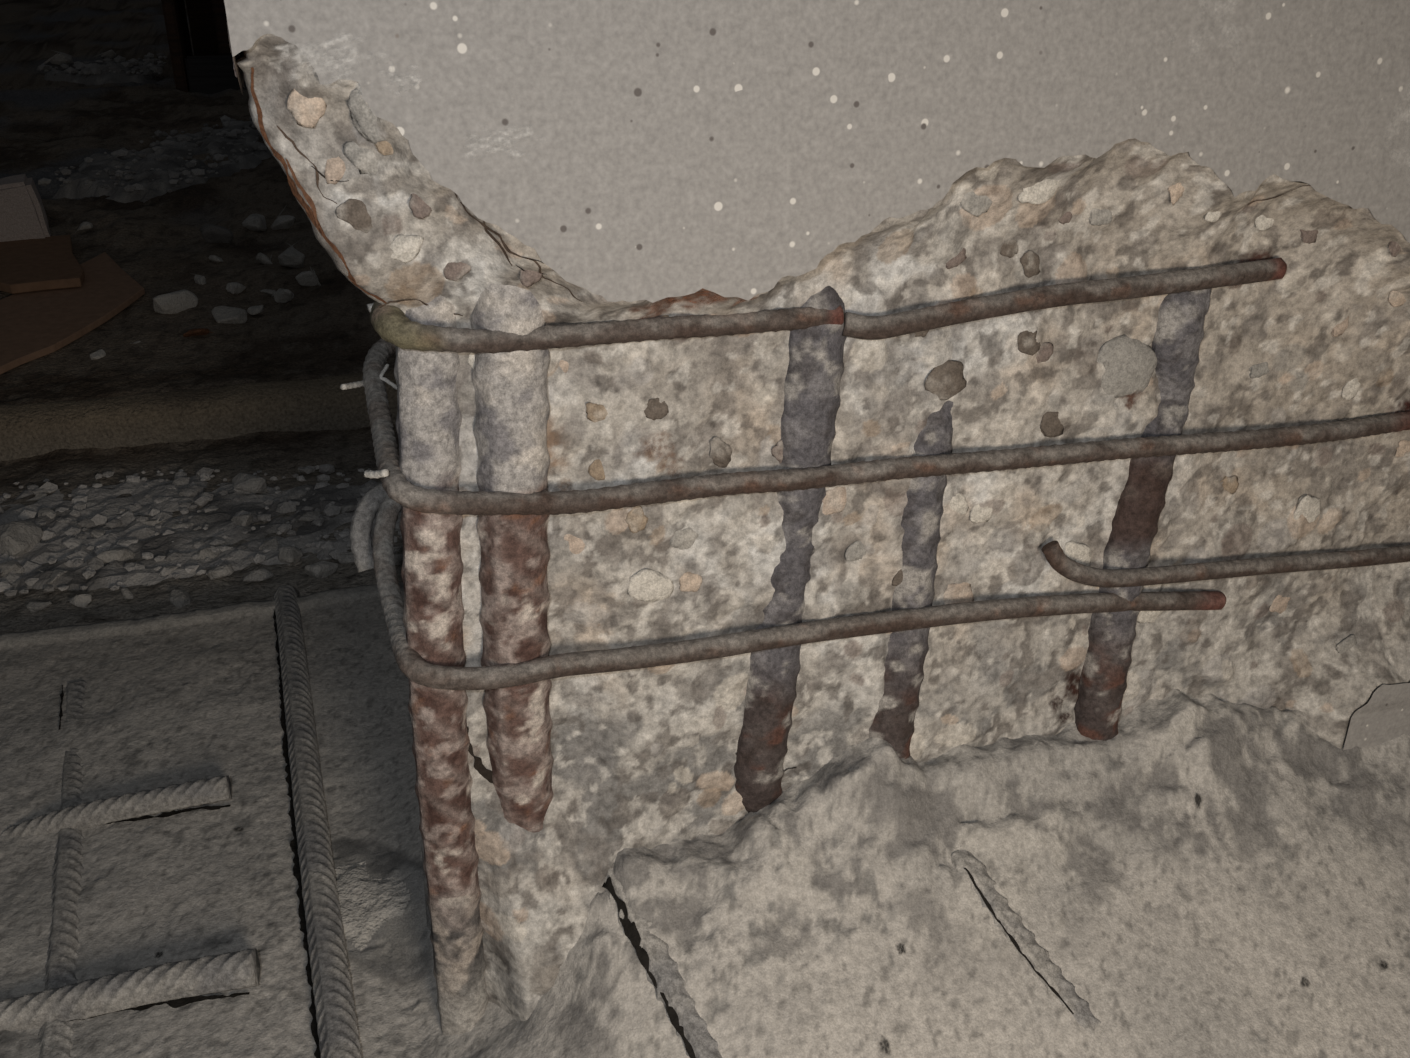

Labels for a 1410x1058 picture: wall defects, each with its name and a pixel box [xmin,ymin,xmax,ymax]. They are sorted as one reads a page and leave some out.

spalling [227,23,1410,435]
spalling [831,294,1168,465]
spalling [547,492,786,656]
spalling [932,458,1131,606]
spalling [1118,430,1410,749]
corrosion [1052,672,1081,722]
crack [106,804,231,824]
crack [273,611,321,1058]
spalling [466,653,751,1021]
crack [69,992,250,1021]
crack [602,877,696,1058]
crack [964,868,1074,1014]